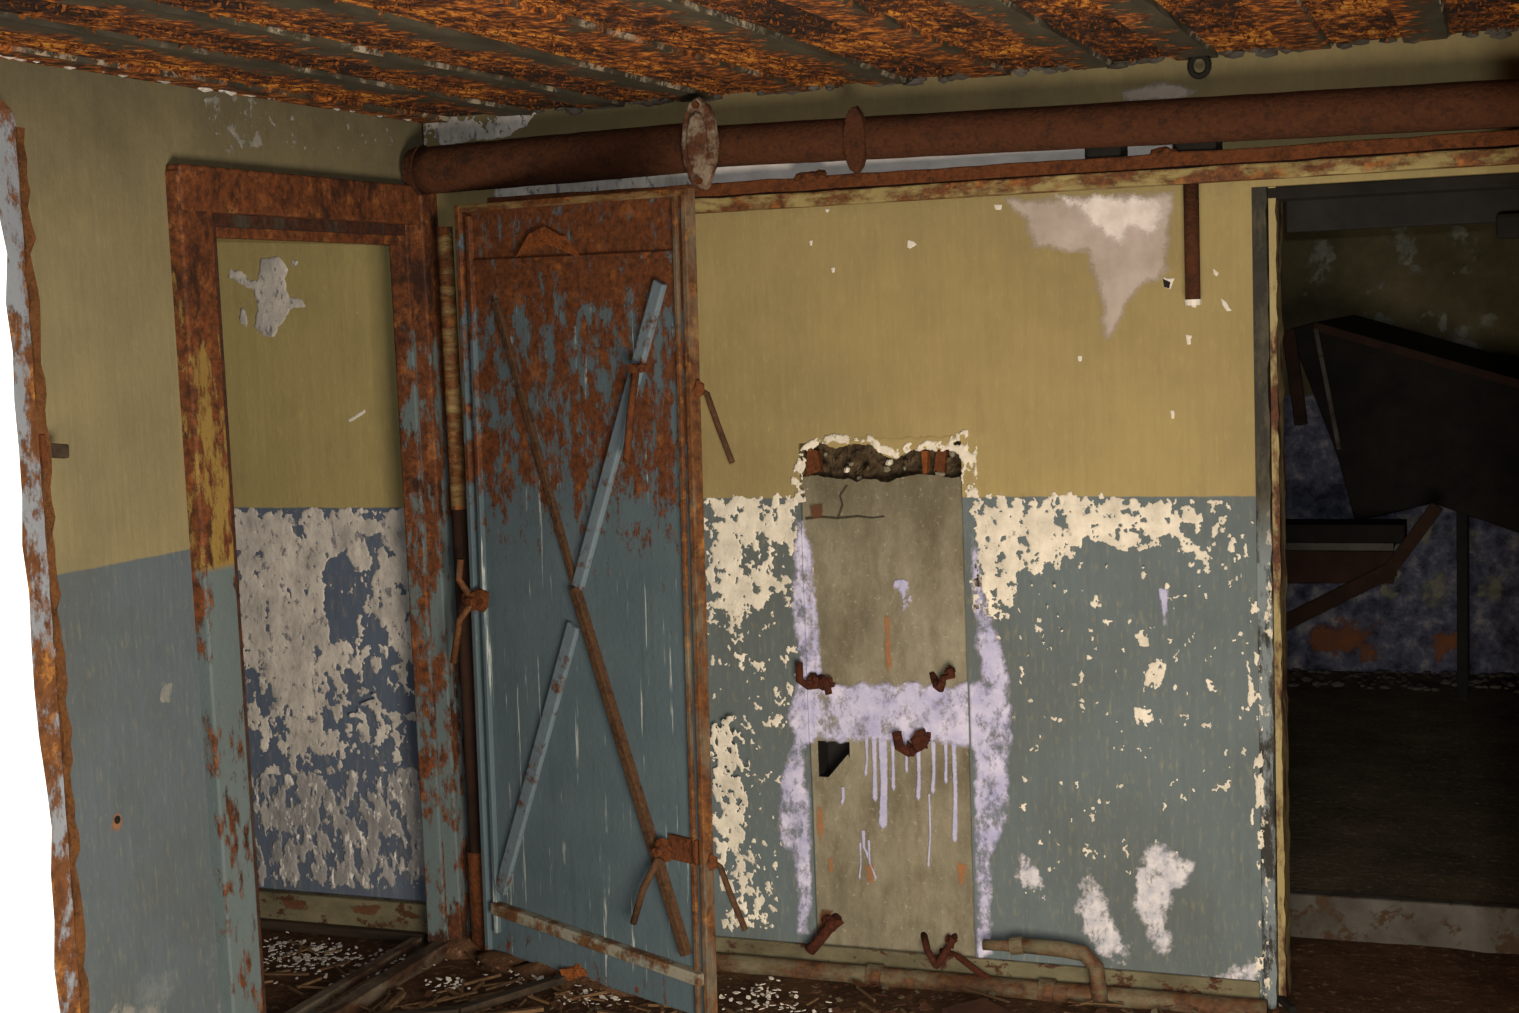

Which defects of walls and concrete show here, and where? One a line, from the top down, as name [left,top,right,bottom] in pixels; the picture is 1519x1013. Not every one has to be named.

corrosion [0,0,953,118]
corrosion [1004,0,1161,63]
peeling [228,256,305,337]
corrosion [516,226,580,257]
peeling [234,507,425,890]
spalling [704,429,1253,962]
peeling [1205,597,1263,731]
damp [859,734,957,879]
peeling [1163,747,1270,993]